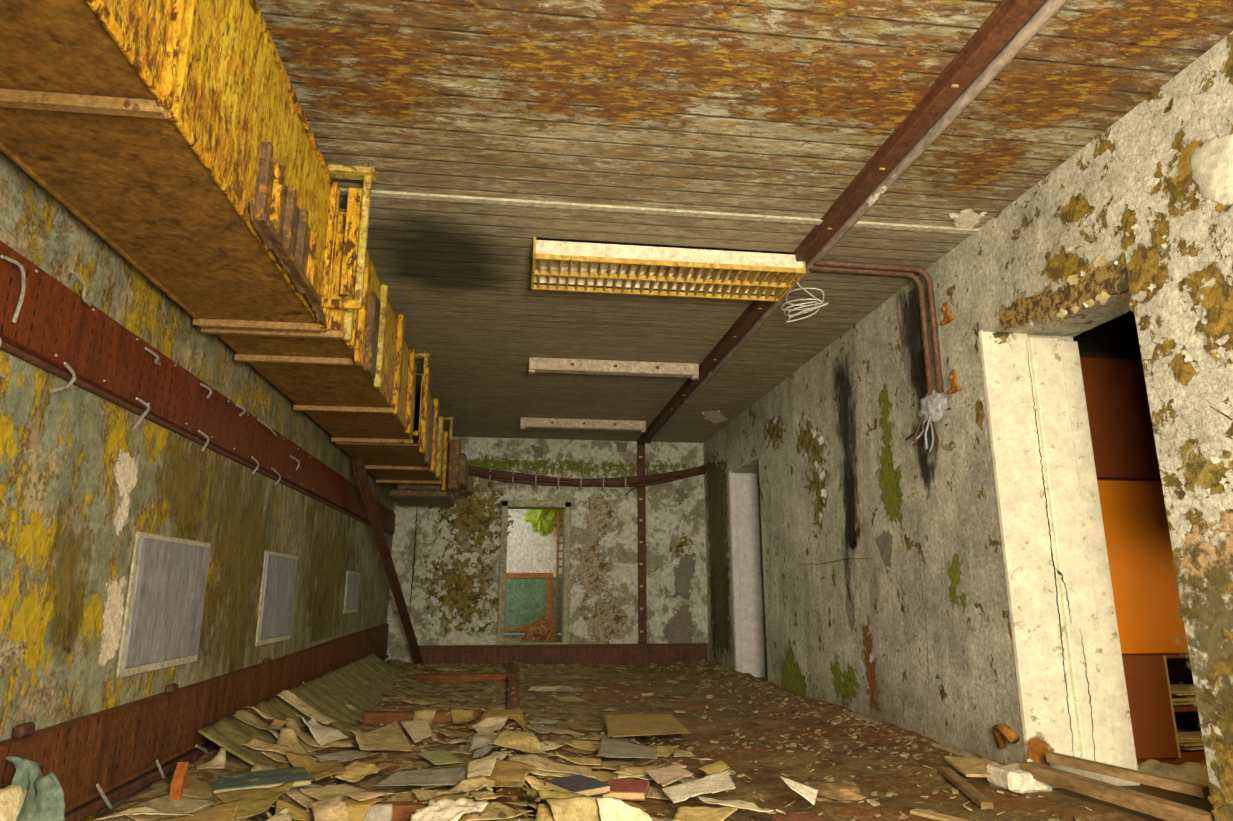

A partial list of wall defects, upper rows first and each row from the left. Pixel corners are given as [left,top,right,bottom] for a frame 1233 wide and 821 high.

peeling [1154,120,1233,219]
spalling [993,190,1233,362]
leakage [899,290,928,400]
peeling [1170,352,1199,386]
peeling [113,449,140,536]
leakage [834,360,858,627]
leakage [887,456,903,542]
leakage [913,419,936,489]
peeling [97,575,127,668]
peeling [420,475,514,640]
peeling [570,490,635,644]
peeling [664,536,696,643]